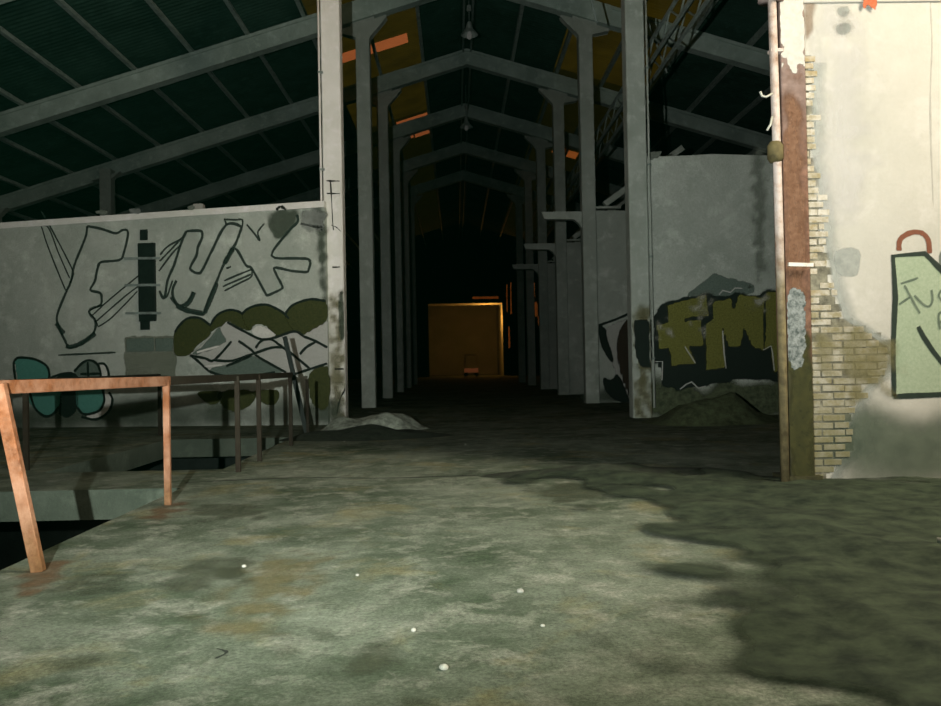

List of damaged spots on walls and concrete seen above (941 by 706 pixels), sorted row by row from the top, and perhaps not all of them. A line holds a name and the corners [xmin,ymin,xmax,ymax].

leakage [13,399,235,428]
leakage [269,208,346,422]
leakage [753,152,764,268]
rust [783,95,807,298]
spalling [780,0,894,479]